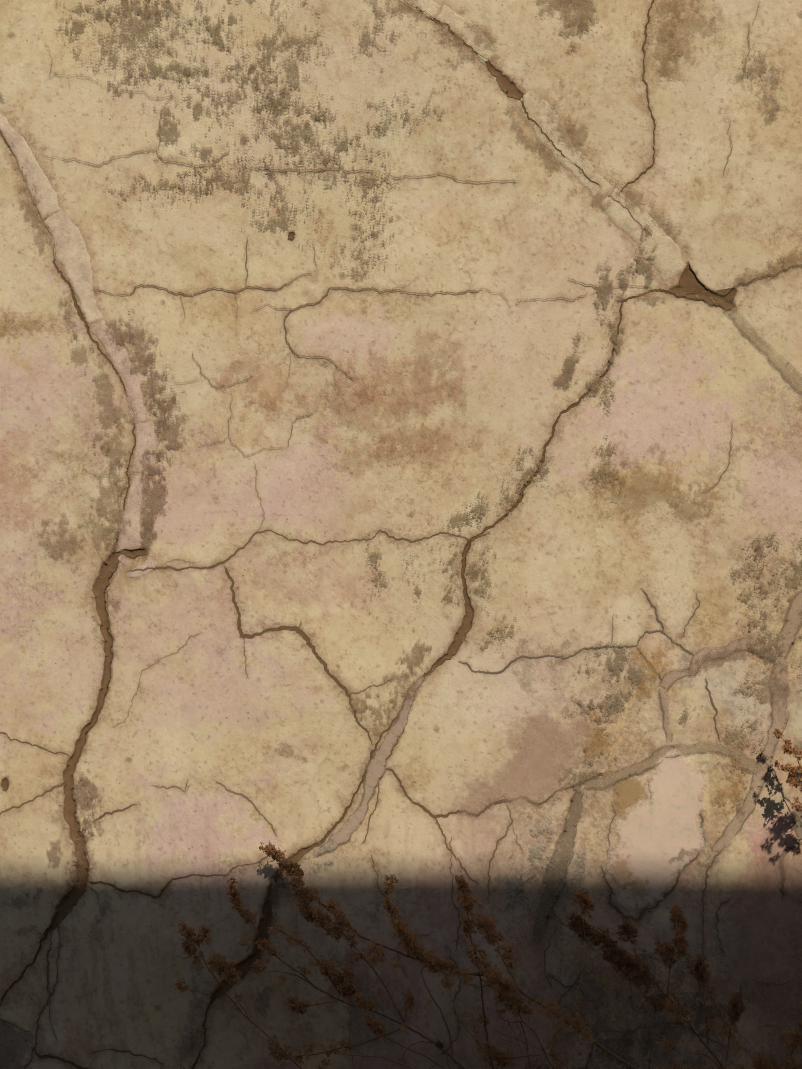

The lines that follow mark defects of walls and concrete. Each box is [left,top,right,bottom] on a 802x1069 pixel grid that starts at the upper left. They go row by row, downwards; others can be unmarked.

crack [0,132,24,177]
damp [55,0,448,282]
crack [48,148,517,188]
crack [408,0,656,230]
crack [93,238,599,381]
crack [599,285,671,378]
crack [732,264,802,288]
crack [0,184,268,1069]
crack [116,388,802,1069]
peeling [607,752,707,910]